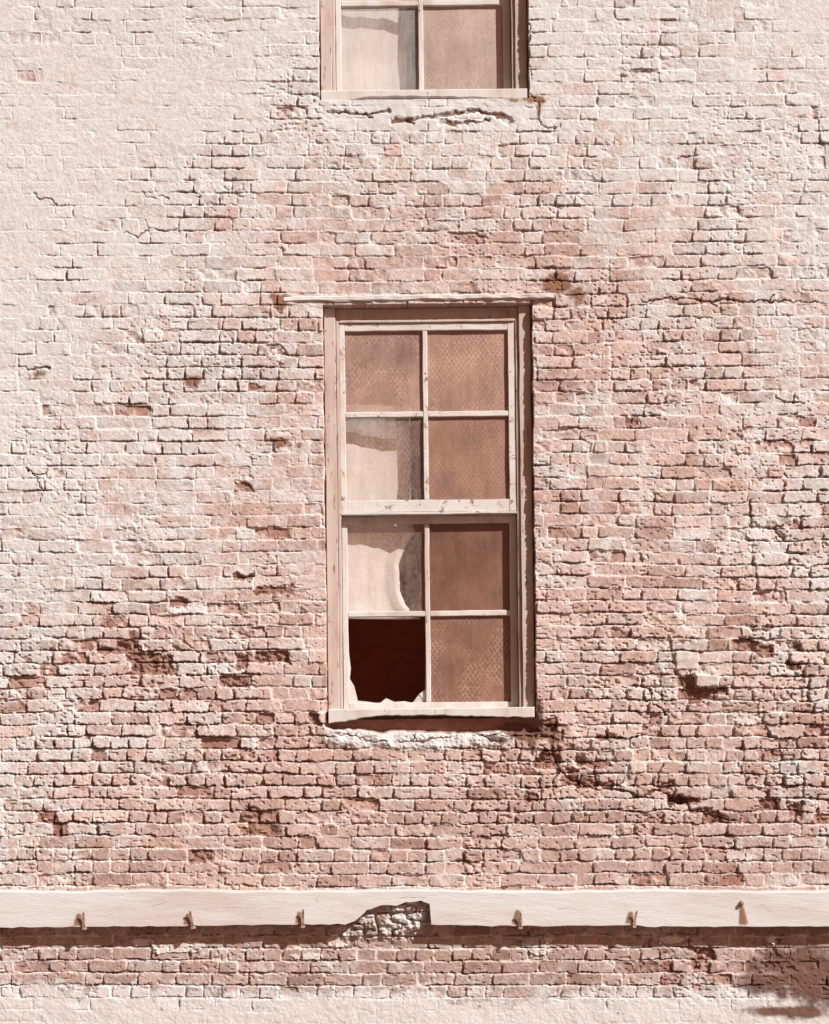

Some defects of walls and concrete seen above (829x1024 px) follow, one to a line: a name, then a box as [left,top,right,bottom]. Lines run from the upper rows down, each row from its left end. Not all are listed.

crack [525,27,533,97]
crack [327,110,510,126]
rust [544,273,585,304]
spalling [731,625,772,659]
spalling [785,643,802,671]
spalling [678,675,728,705]
crack [541,745,736,821]